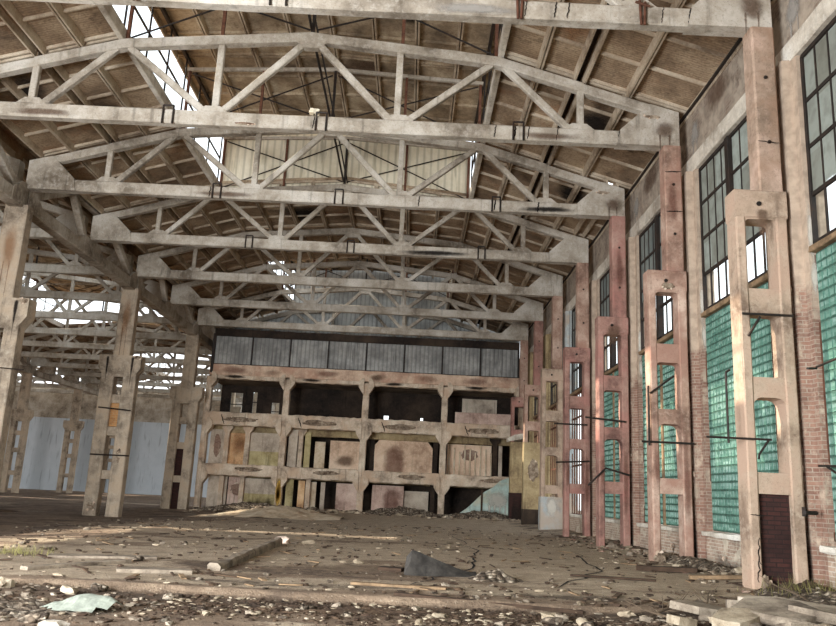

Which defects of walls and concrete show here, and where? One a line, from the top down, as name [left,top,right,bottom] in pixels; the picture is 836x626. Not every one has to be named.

leakage [744,0,759,32]